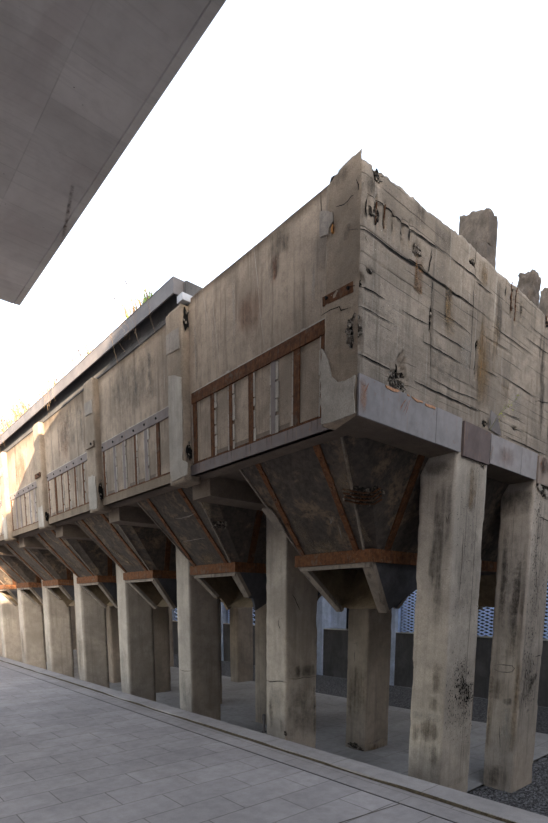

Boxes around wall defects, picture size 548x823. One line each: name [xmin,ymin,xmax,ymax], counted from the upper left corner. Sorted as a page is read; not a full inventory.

spalling [365,199,422,257]
crack [320,179,548,412]
spalling [345,312,363,350]
spalling [385,364,436,409]
crack [503,412,548,455]